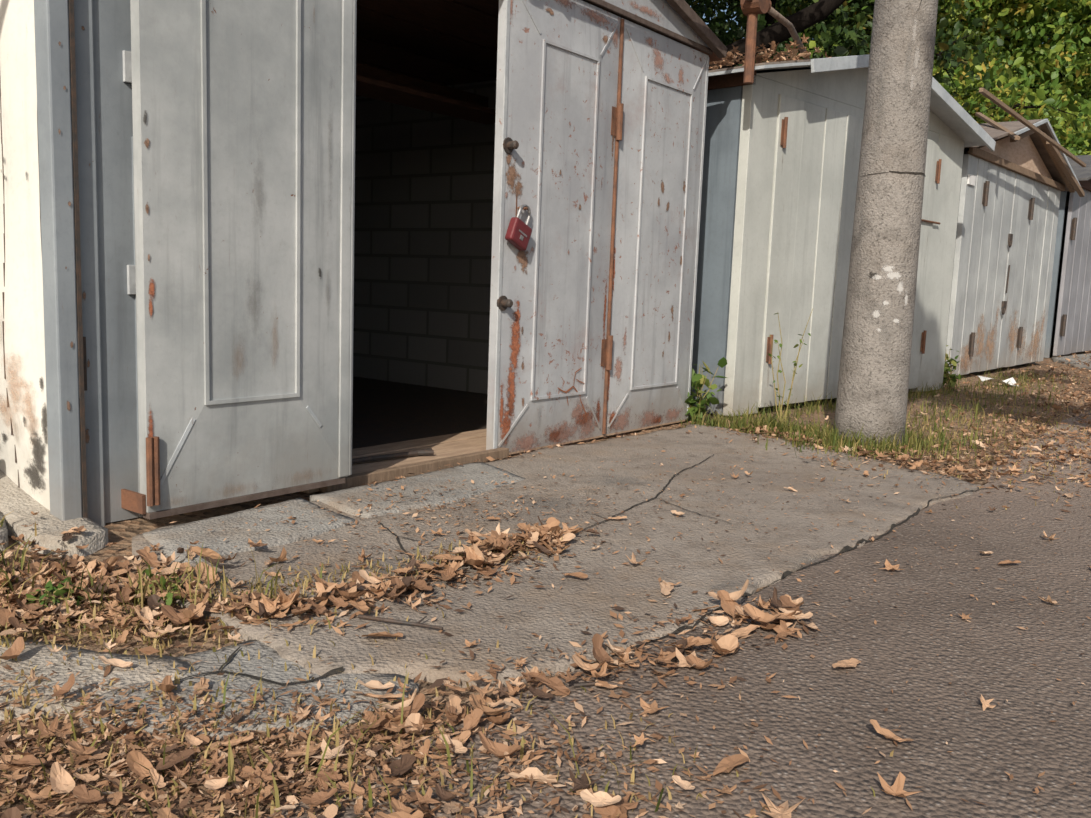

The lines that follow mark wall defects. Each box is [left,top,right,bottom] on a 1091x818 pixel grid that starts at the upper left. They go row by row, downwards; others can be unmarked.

peeling [546,0,618,45]
peeling [646,38,684,84]
corrosion [603,248,616,341]
corrosion [499,300,682,452]
leakage [23,403,47,489]
crack [576,454,729,534]
crack [591,488,986,664]